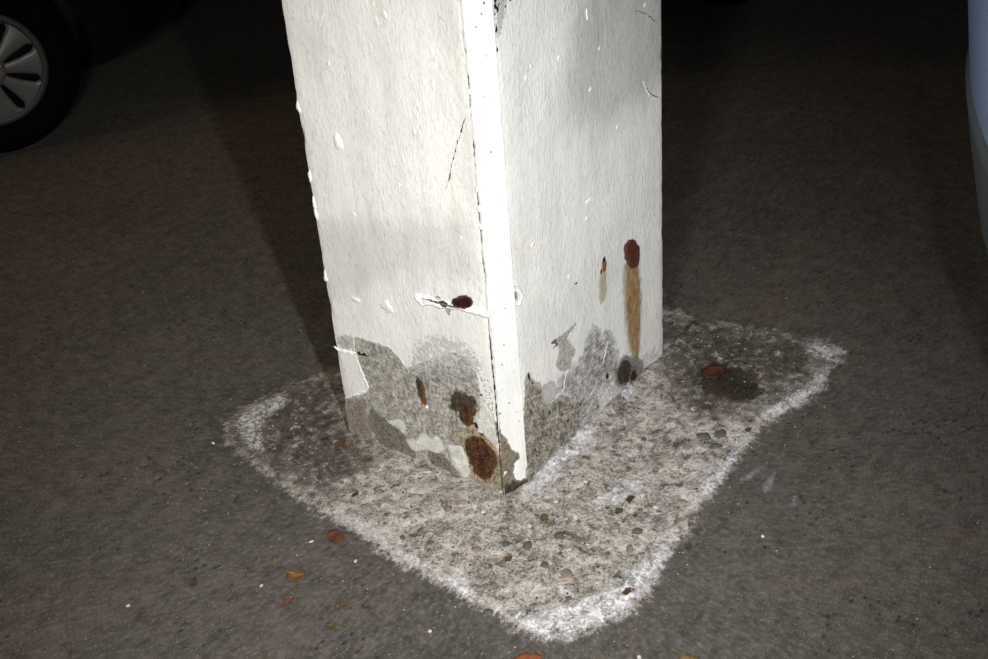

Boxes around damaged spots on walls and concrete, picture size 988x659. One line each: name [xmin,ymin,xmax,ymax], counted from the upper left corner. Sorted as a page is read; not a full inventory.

corrosion [615,239,643,388]
leakage [235,394,291,451]
peeling [344,337,498,483]
leakage [409,336,494,417]
corrosion [450,392,503,489]
leakage [499,382,633,495]
peeling [523,323,618,480]
leakage [699,442,745,496]
leakage [697,363,762,400]
leakage [762,341,841,419]
leakage [325,508,477,602]
leakage [507,539,672,640]